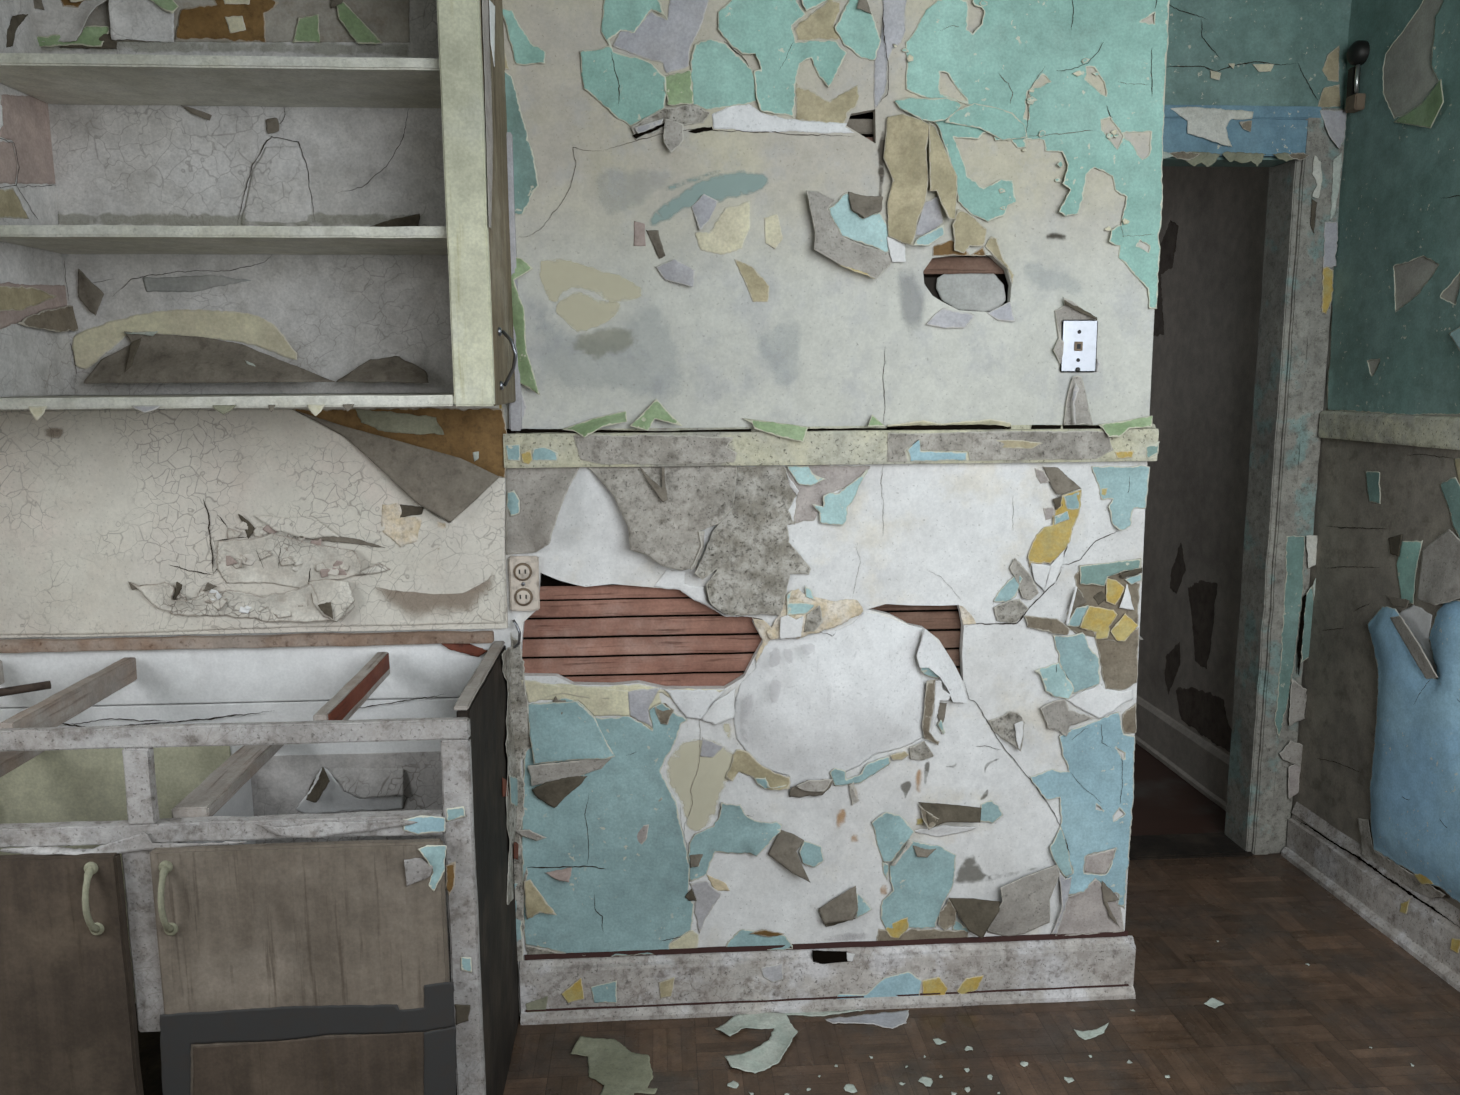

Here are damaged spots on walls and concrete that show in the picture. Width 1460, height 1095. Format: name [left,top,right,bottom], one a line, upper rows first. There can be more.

peeling [489,0,545,215]
peeling [580,0,1460,415]
crack [171,499,245,575]
peeling [128,503,446,622]
peeling [442,570,976,962]
flaking render [785,465,870,526]
peeling [868,415,1042,462]
flaking render [988,711,1025,751]
peeling [994,358,1160,909]
peeling [1164,543,1232,752]
peeling [1274,535,1318,799]
peeling [1358,534,1460,953]